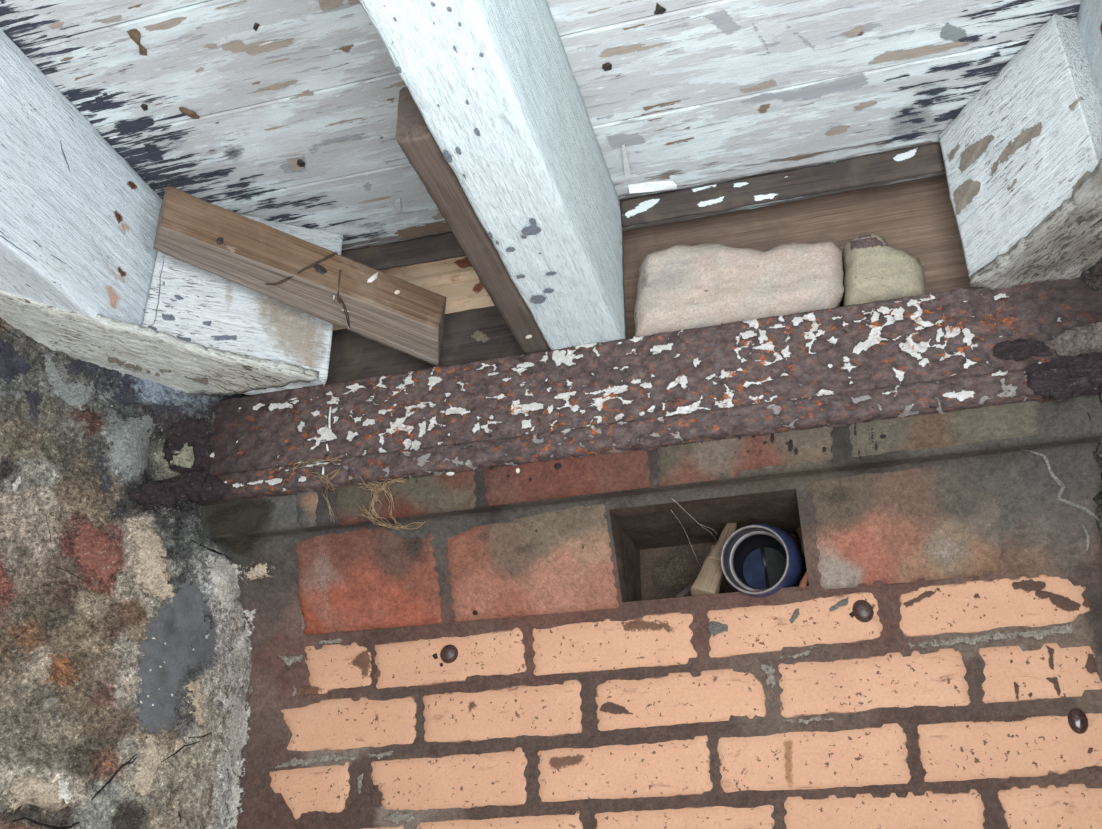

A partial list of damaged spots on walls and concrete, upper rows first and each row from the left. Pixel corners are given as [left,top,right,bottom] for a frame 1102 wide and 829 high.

peeling [740,22,971,113]
peeling [893,147,918,161]
peeling [947,122,1042,215]
peeling [623,199,660,218]
peeling [692,185,724,207]
peeling [754,193,777,201]
peeling [871,306,905,323]
peeling [740,317,806,343]
flaking render [0,339,171,424]
peeling [239,397,342,432]
peeling [522,379,652,429]
peeling [943,390,974,401]